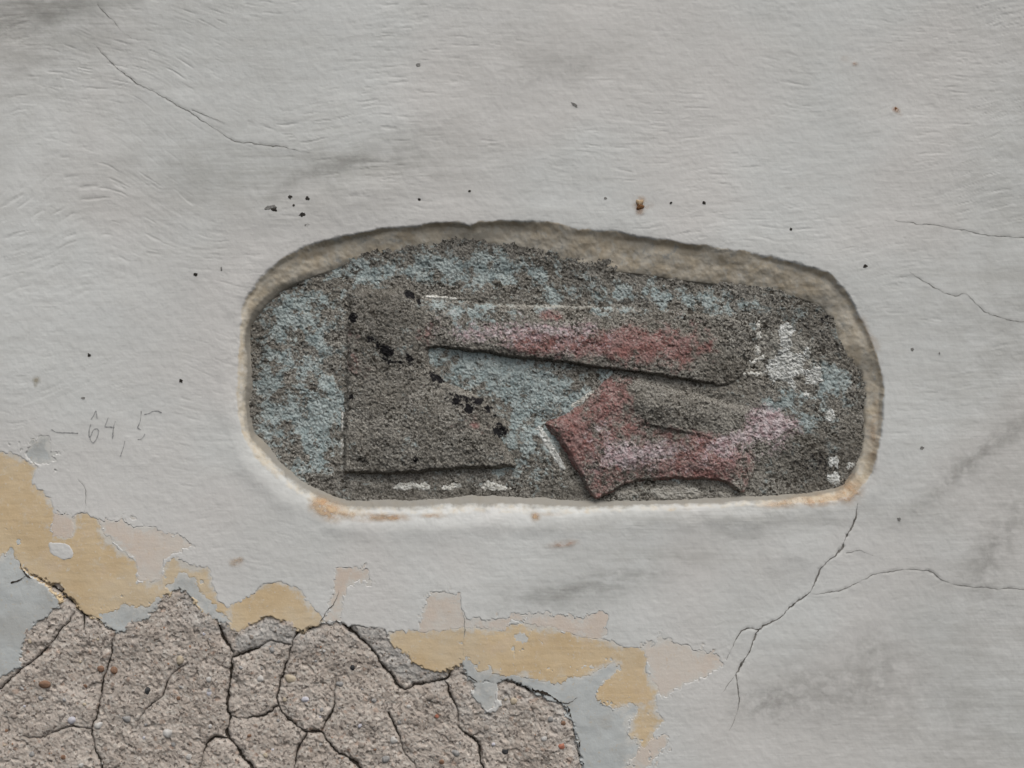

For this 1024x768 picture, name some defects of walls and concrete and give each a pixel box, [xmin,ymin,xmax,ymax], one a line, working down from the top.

crack [93,43,298,151]
crack [910,272,1024,322]
peeling [615,483,704,500]
crack [0,564,115,768]
spalling [0,435,672,768]
crack [200,593,584,768]
crack [724,504,1024,727]